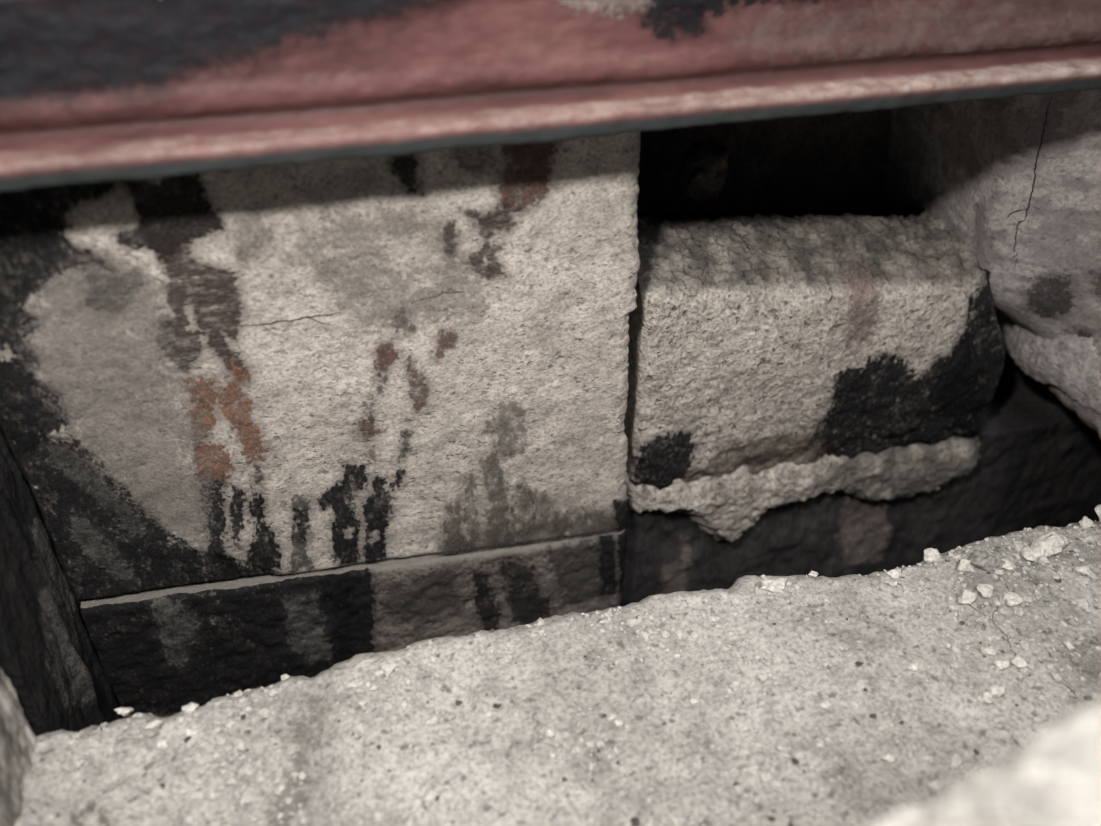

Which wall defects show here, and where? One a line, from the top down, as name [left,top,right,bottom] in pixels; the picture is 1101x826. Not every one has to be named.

leakage [295,200,491,333]
rust [442,142,558,280]
crack [1007,97,1052,265]
leakage [18,242,213,548]
rust [117,173,282,571]
leakage [682,339,988,483]
leakage [68,508,134,581]